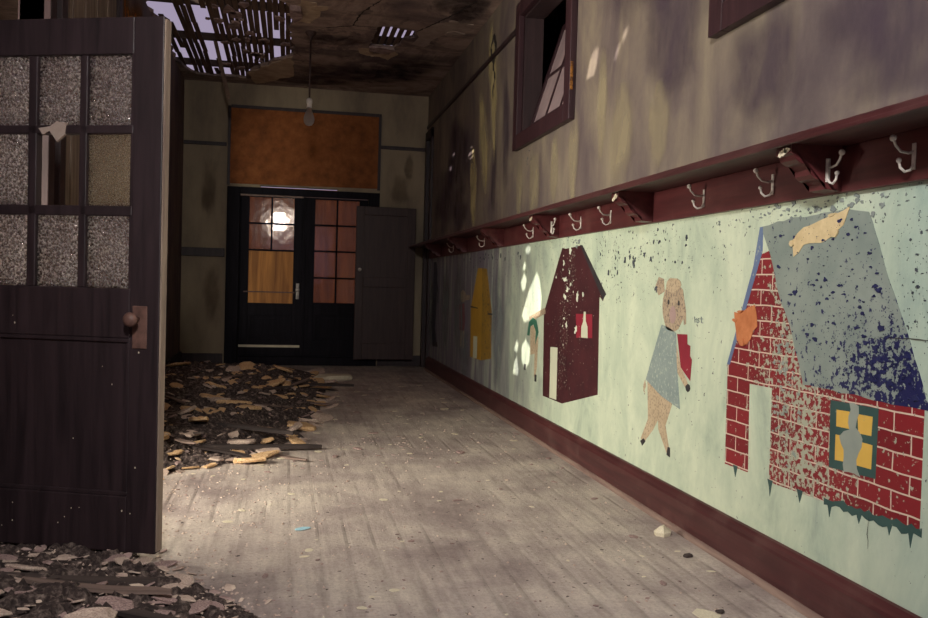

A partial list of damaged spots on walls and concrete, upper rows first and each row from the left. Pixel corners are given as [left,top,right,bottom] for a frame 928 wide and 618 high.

peeling [732,181,928,467]